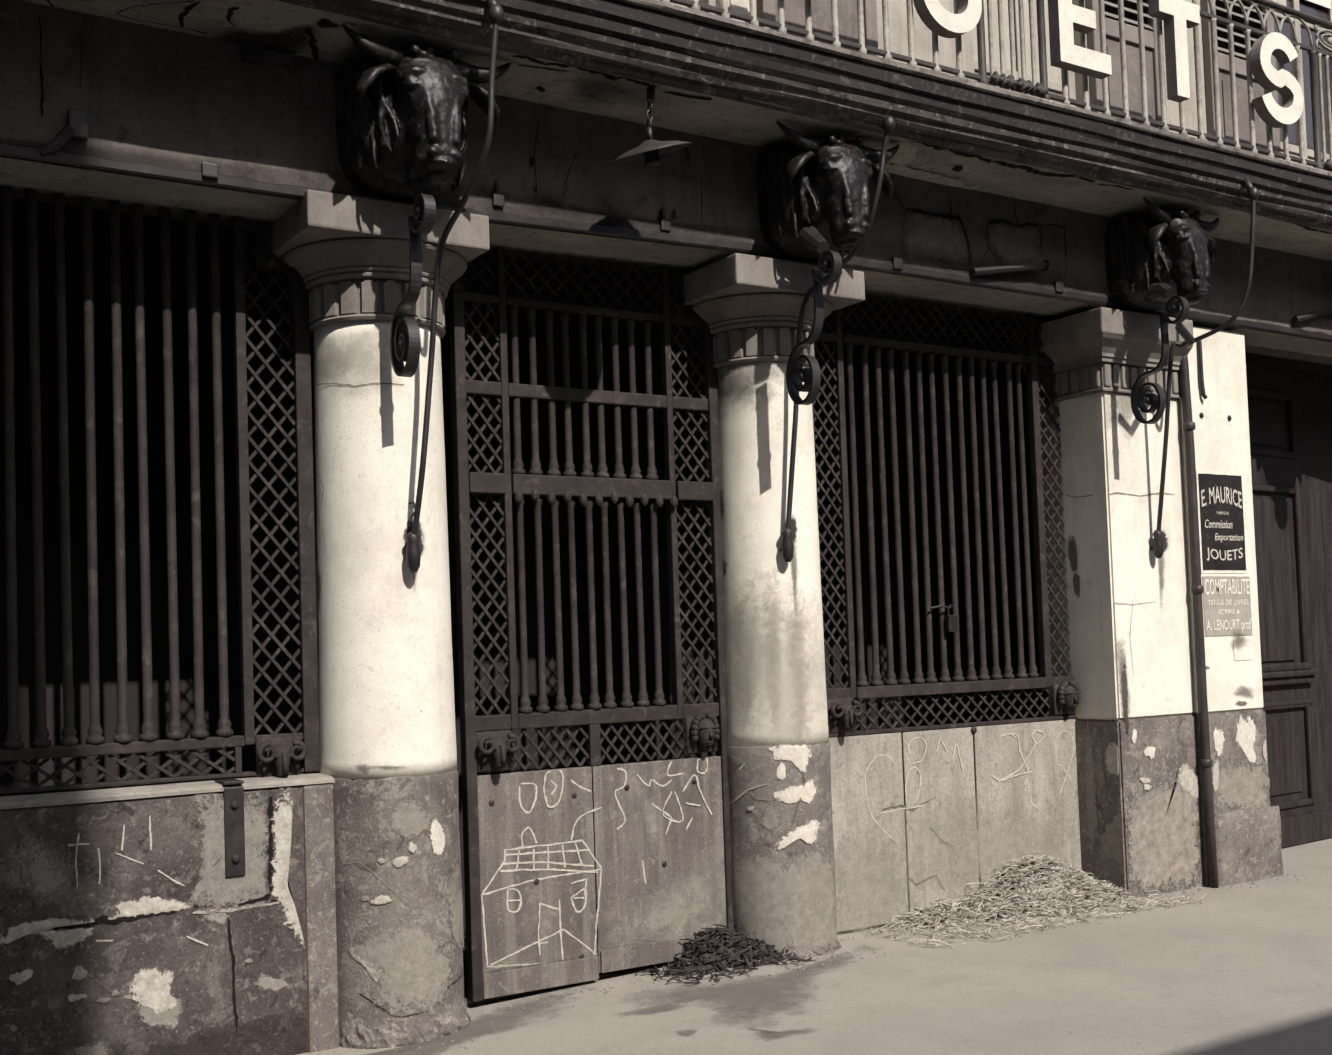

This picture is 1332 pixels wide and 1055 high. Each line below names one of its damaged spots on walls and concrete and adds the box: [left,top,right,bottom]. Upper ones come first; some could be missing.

crack [39,0,54,116]
crack [115,1,239,34]
crack [304,28,319,60]
spalling [1084,687,1270,896]
peeling [179,788,306,949]
spalling [378,800,445,867]
spalling [731,742,837,951]
spalling [8,968,34,985]
spalling [68,965,182,1029]
crack [0,896,279,1031]
spalling [255,974,292,991]